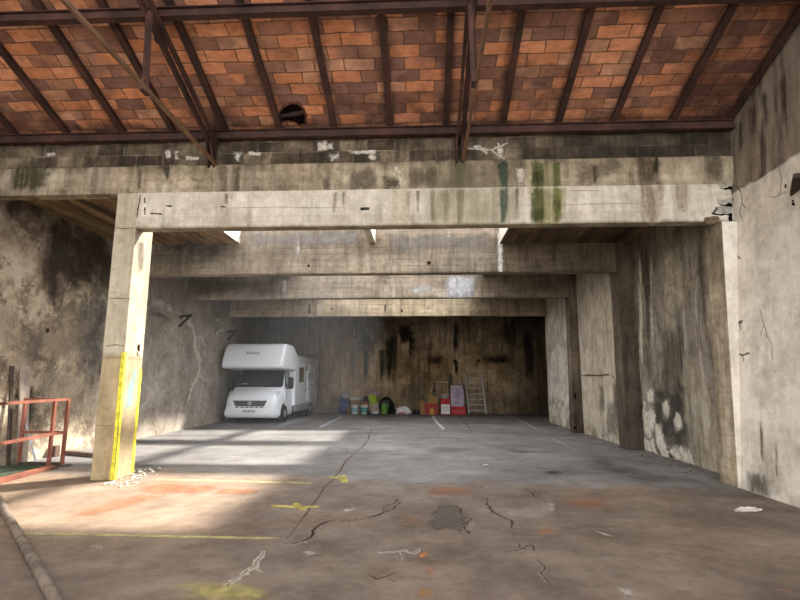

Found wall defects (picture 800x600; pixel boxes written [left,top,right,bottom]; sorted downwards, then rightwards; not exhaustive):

damp [531,162,560,222]
spalling [704,182,734,225]
damp [43,218,112,386]
damp [380,337,396,377]
damp [420,353,458,381]
damp [503,319,534,376]
flaking render [643,388,694,464]
crack [284,428,403,546]
crack [416,483,550,583]